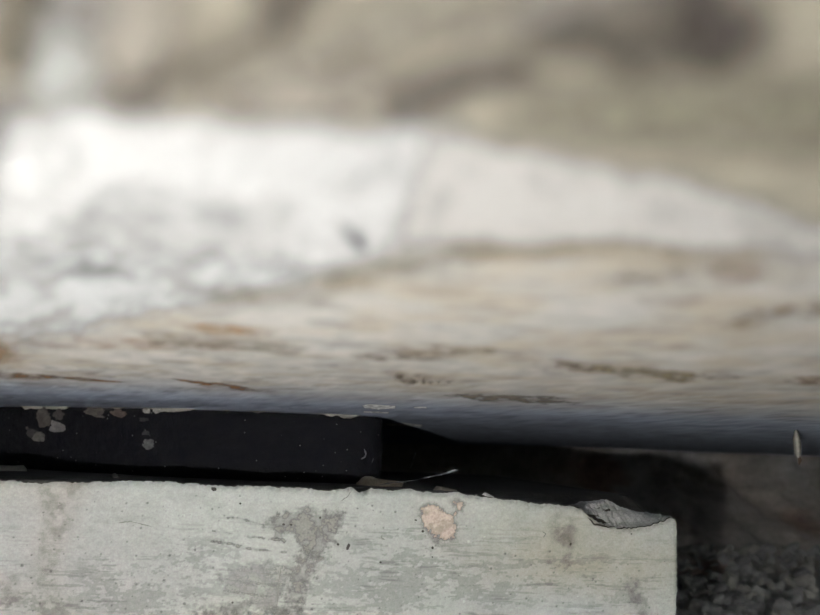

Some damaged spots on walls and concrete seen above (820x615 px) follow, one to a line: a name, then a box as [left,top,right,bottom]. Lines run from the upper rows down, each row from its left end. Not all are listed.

damp [257,507,346,615]
spalling [570,499,671,528]